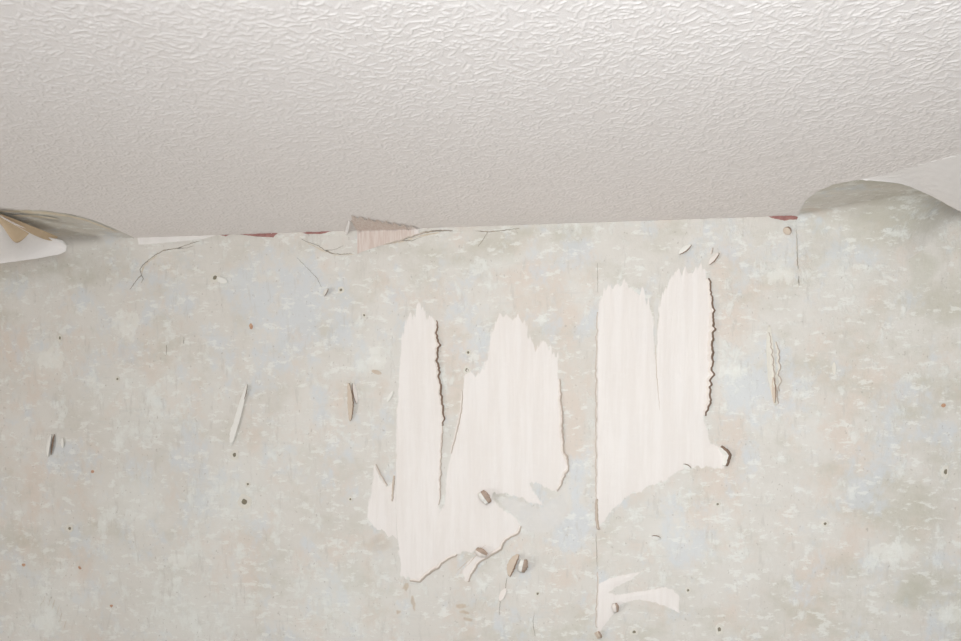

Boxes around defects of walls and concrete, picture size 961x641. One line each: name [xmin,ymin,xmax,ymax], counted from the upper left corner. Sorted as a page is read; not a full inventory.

peeling [800,155,961,214]
peeling [0,205,217,263]
peeling [229,385,247,461]
peeling [364,299,574,584]
peeling [592,244,732,534]
peeling [499,554,528,615]
peeling [594,568,691,639]